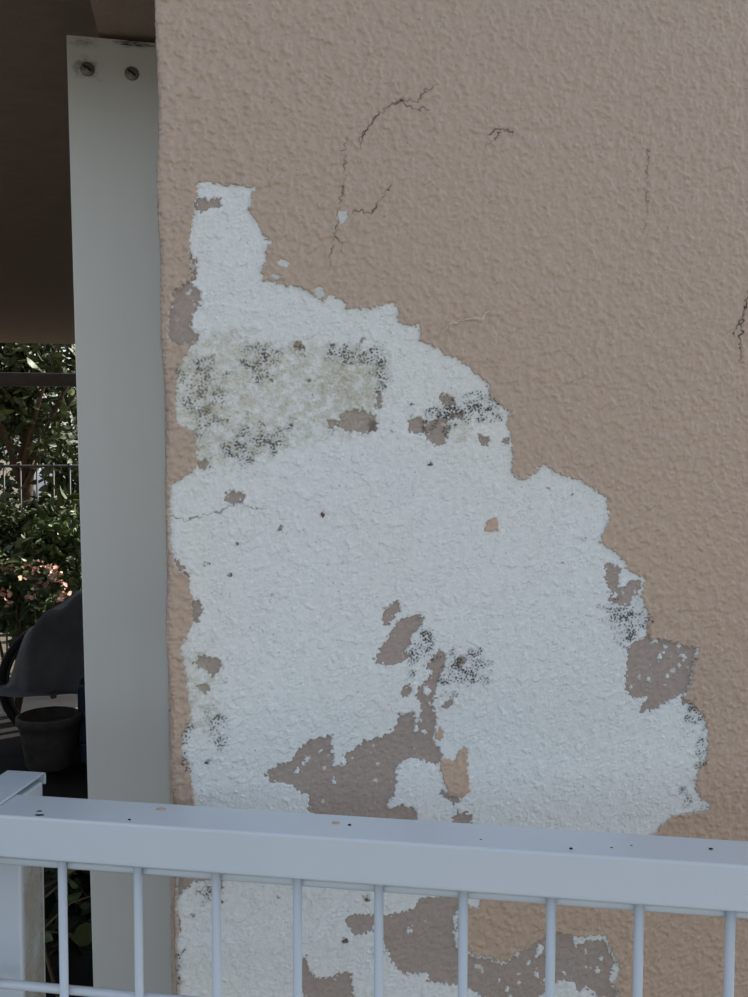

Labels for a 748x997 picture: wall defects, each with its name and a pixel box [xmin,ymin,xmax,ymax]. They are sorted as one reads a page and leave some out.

crack [736,297,748,361]
damp [176,355,227,437]
damp [223,424,293,461]
damp [240,343,279,383]
damp [324,338,388,392]
damp [423,390,502,436]
peeling [168,182,710,835]
peeling [177,877,620,997]